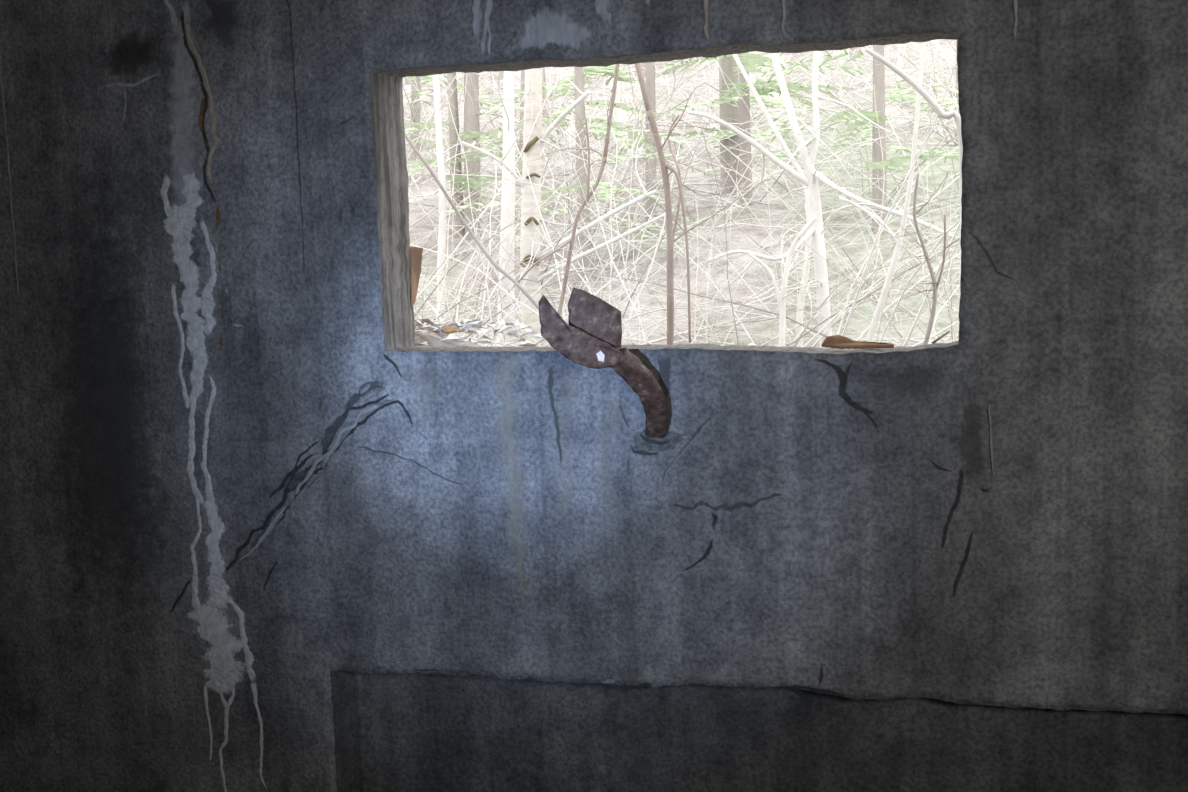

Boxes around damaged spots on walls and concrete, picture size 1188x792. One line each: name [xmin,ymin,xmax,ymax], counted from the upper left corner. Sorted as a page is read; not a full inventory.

leakage [519,9,591,49]
leakage [595,0,611,23]
crack [181,14,244,349]
leakage [160,0,267,792]
crack [817,359,879,431]
crack [226,354,460,589]
crack [663,418,709,478]
crack [675,492,791,570]
crack [171,578,192,612]